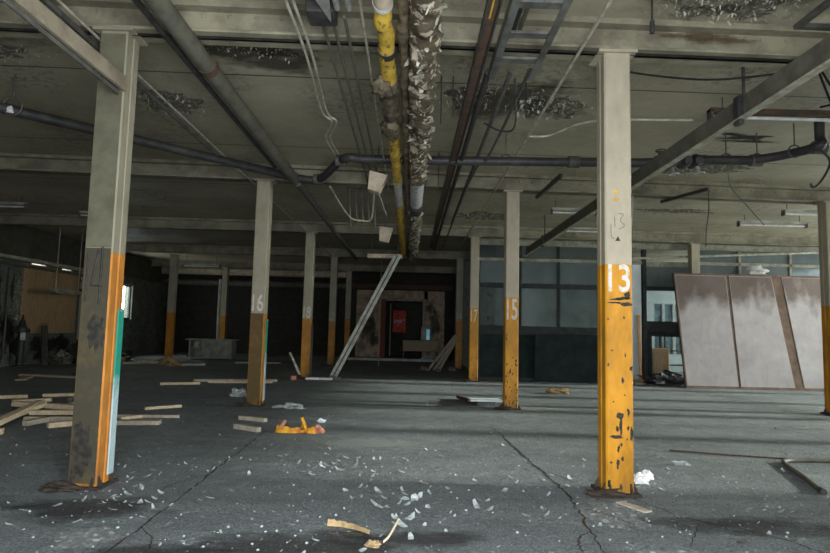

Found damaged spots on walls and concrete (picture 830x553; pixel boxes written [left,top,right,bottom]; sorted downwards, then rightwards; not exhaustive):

peeling [638,0,817,26]
peeling [389,0,466,263]
peeling [472,82,592,125]
peeling [607,292,632,319]
peeling [610,409,634,469]
crack [493,428,634,553]